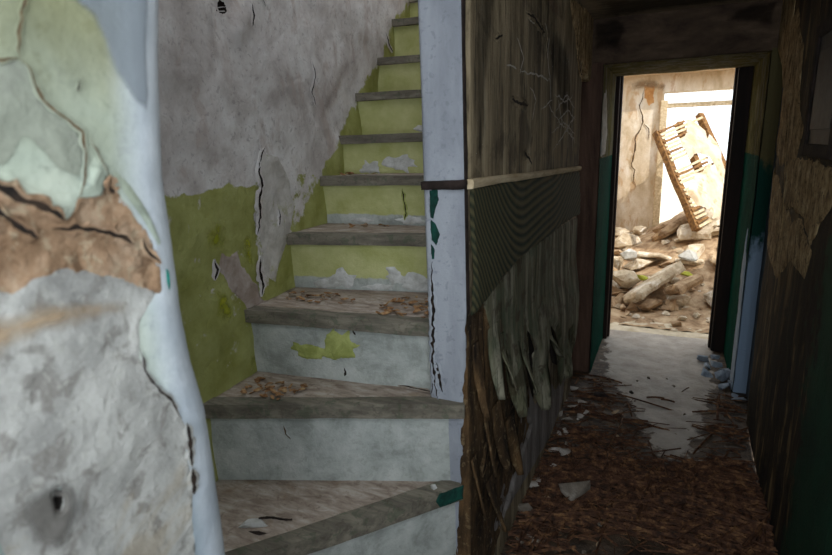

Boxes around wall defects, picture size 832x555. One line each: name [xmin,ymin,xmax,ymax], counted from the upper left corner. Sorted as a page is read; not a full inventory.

spalling [216,0,227,17]
crack [0,0,109,196]
crack [254,147,281,235]
peeling [259,155,294,282]
peeling [359,154,417,173]
peeling [395,190,440,259]
flaking render [767,8,832,279]
flaking render [0,60,195,555]
crack [256,256,266,297]
peeling [291,329,360,360]
peeling [313,267,428,292]
peeling [430,171,589,555]